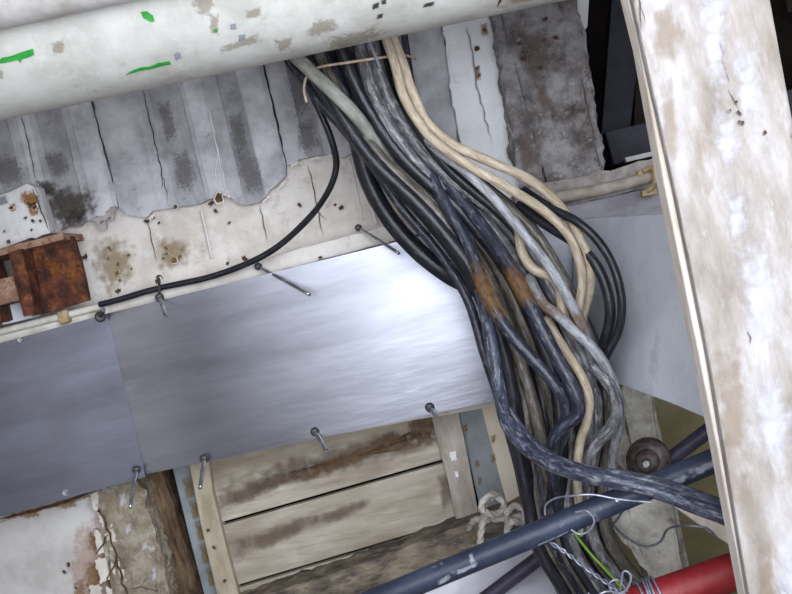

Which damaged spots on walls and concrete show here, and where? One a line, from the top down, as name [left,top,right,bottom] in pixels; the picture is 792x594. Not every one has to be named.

rust [0,192,38,216]
damp [37,181,95,228]
flaking render [89,488,127,594]